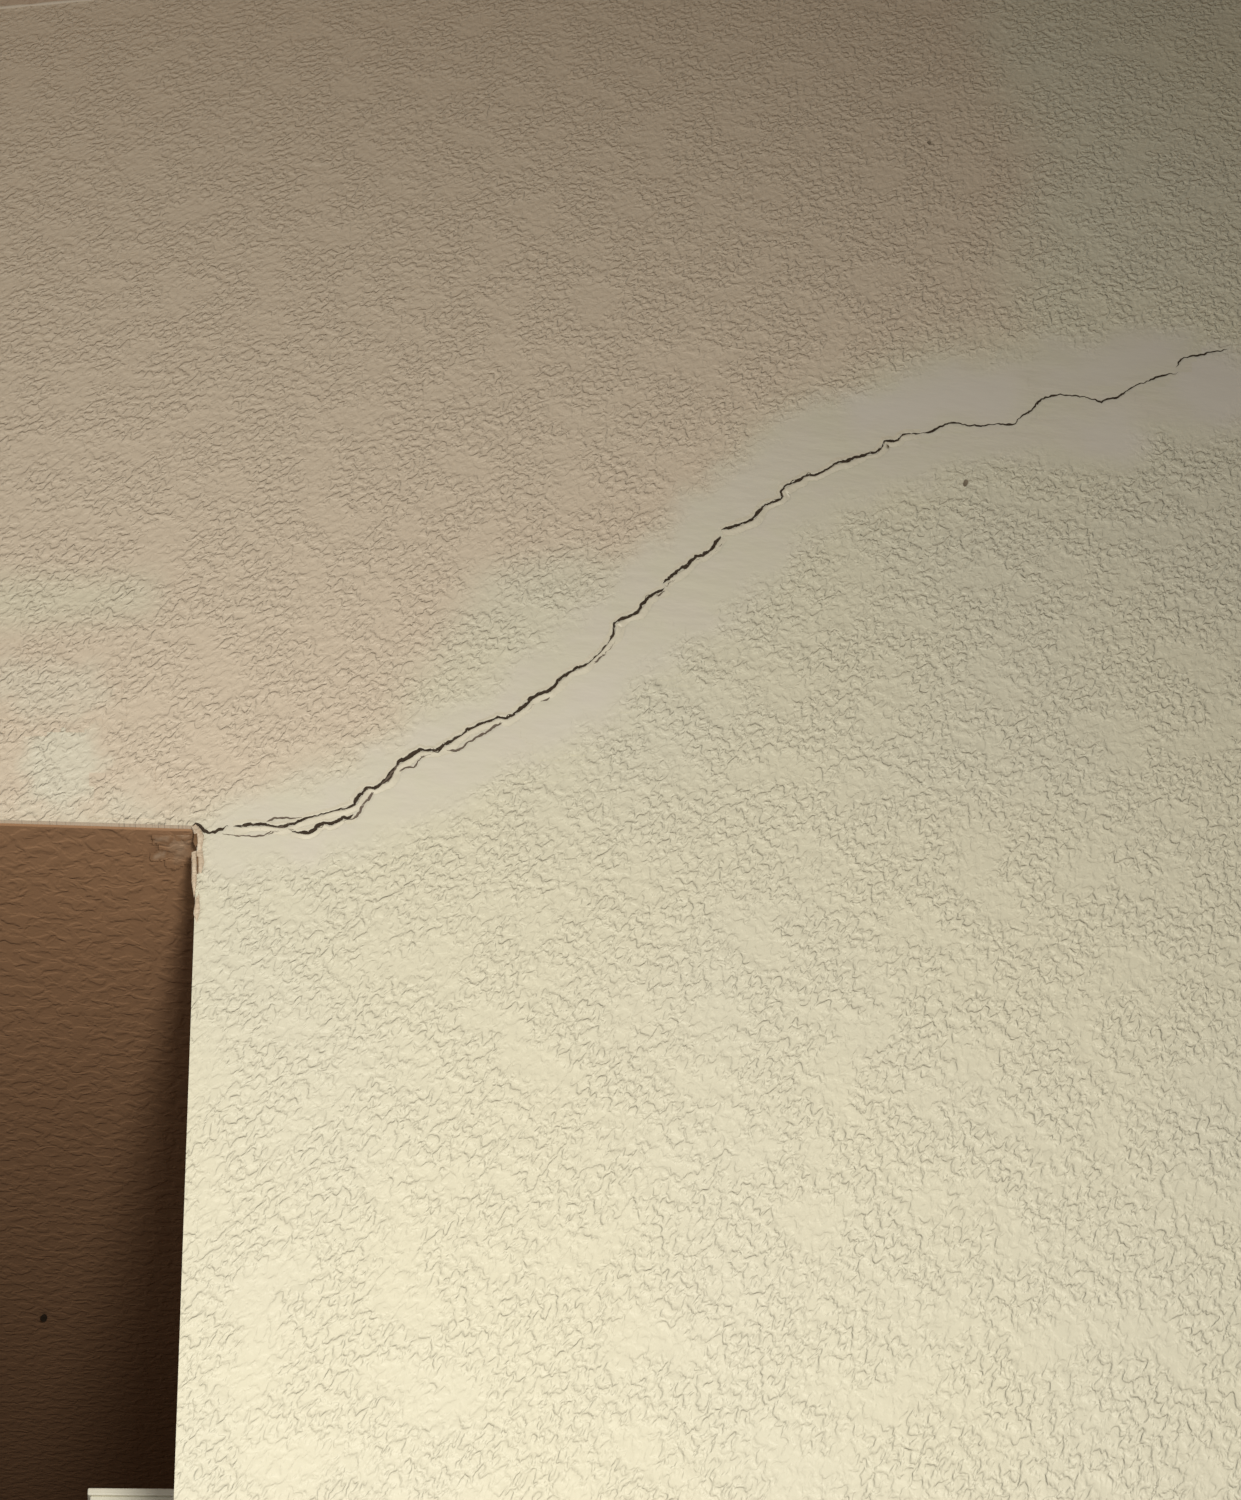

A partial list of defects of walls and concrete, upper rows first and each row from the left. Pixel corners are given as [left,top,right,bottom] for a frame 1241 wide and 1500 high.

crack [192,349,1227,839]